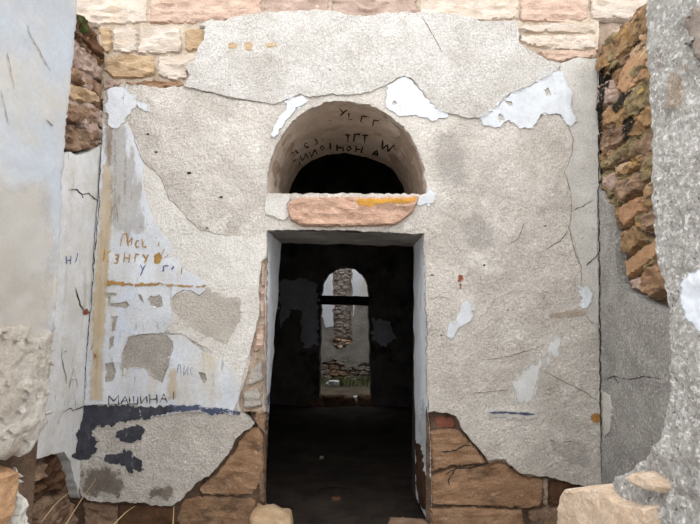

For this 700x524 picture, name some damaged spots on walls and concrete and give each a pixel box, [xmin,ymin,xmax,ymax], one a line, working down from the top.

flaking render [64,0,669,309]
crack [72,168,101,388]
flaking render [32,257,269,524]
peeling [440,300,476,339]
crack [441,445,485,486]
flaking render [414,400,584,524]
peeling [488,335,561,421]
crack [535,113,658,450]